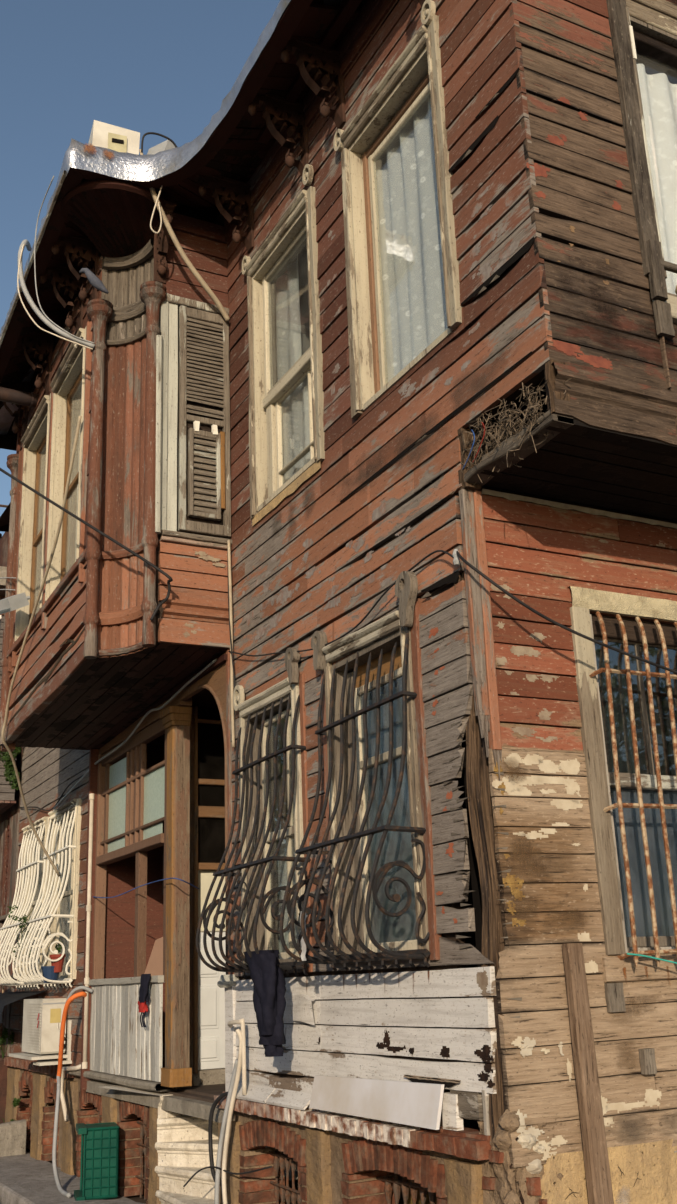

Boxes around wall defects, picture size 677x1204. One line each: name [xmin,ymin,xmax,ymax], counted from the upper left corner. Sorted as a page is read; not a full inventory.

peeling [496,632,560,695]
peeling [492,708,583,839]
spalling [511,1036,572,1082]
peeling [601,1089,662,1128]
spalling [482,1109,568,1204]